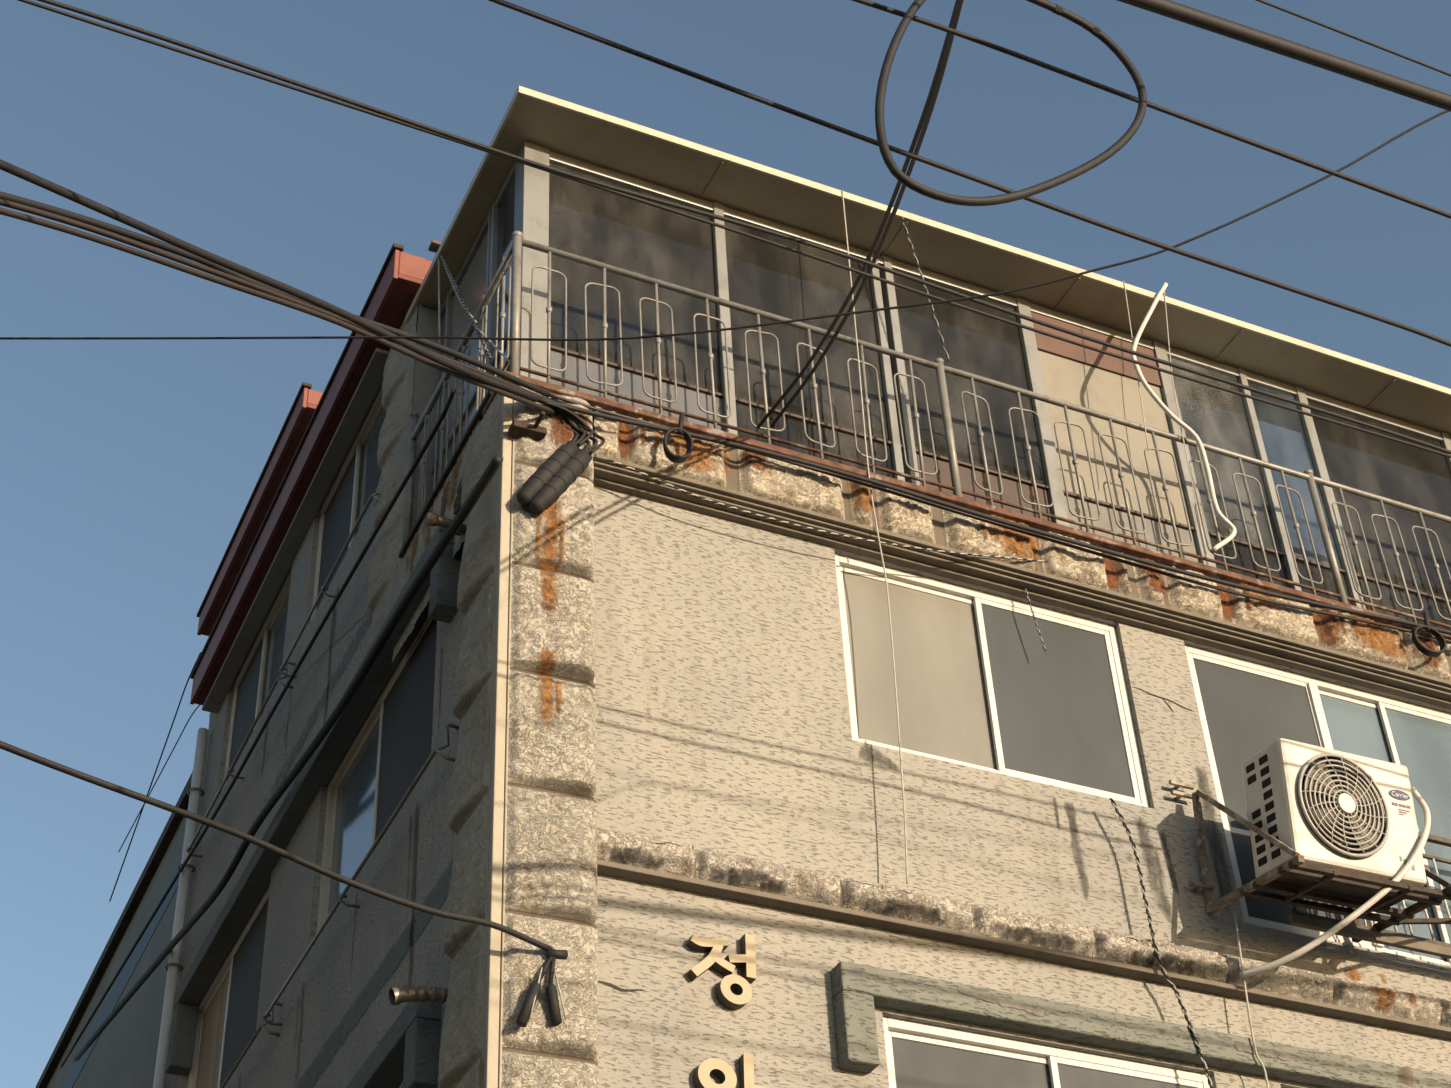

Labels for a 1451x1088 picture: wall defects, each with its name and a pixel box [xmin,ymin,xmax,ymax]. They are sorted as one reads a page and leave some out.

rust [619,419,768,473]
rust [536,500,565,610]
rust [982,515,1038,558]
rust [1102,552,1165,595]
rust [1216,583,1276,618]
rust [1312,608,1441,667]
rust [538,651,562,723]
water stain [407,805,418,985]